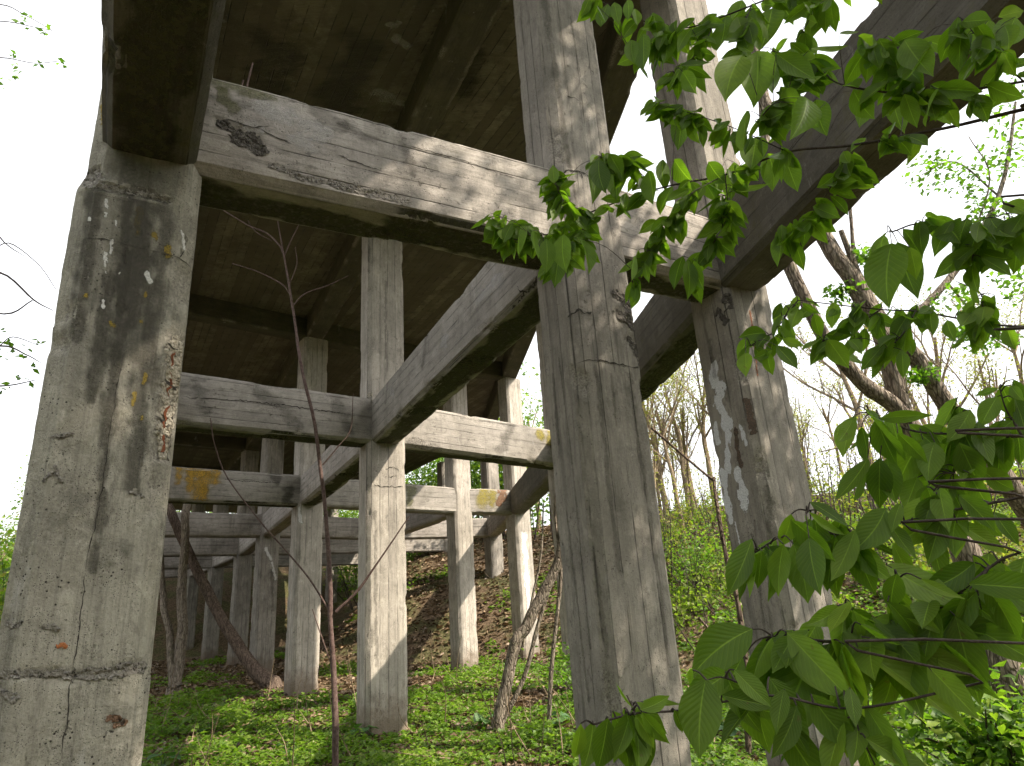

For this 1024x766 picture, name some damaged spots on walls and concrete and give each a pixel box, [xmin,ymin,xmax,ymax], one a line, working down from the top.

spalling [82,168,171,203]
spalling [215,119,411,206]
damp [71,0,210,529]
rust [161,353,175,452]
spalling [155,335,183,461]
crack [579,359,639,368]
peeling [709,360,758,545]
crack [59,344,127,765]